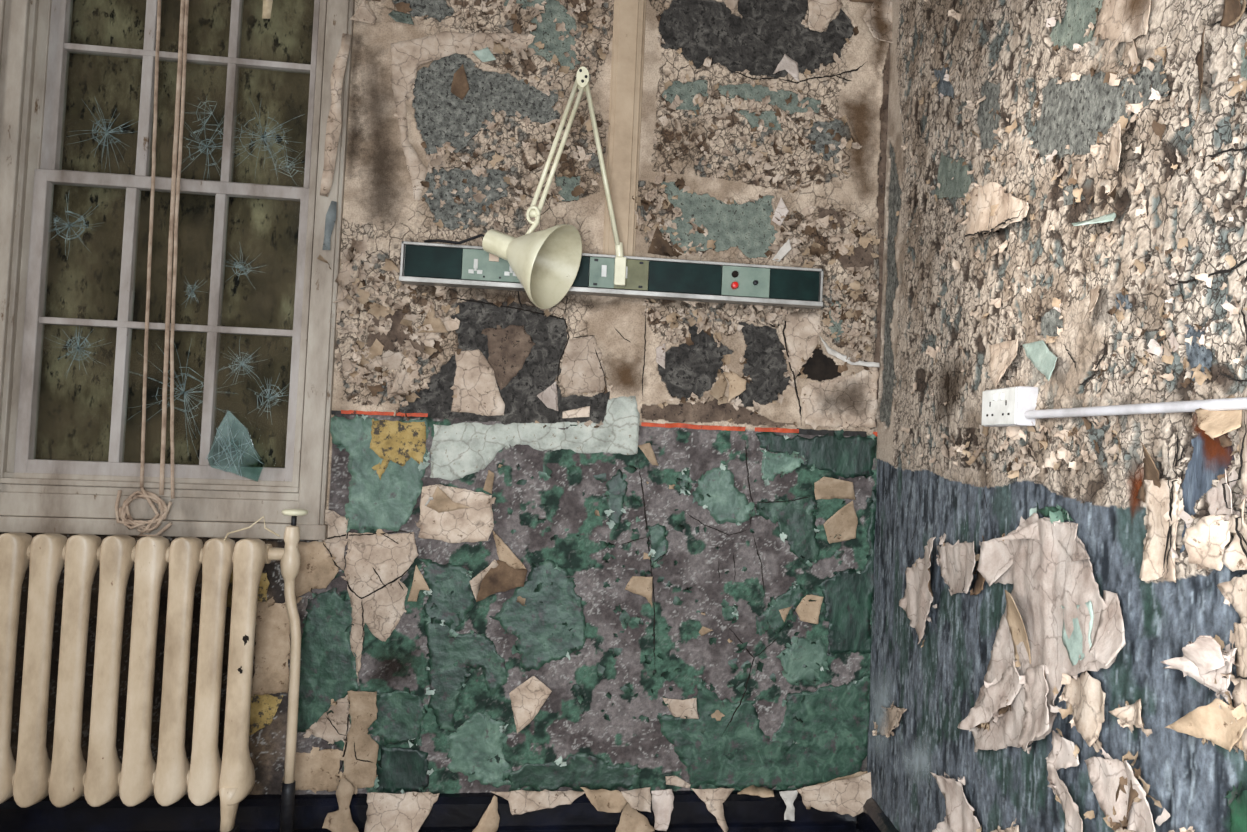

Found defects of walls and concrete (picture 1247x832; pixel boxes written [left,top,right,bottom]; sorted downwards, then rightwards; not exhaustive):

peeling [591,473,824,734]
peeling [899,395,1247,832]
peeling [251,510,440,832]
peeling [484,676,552,734]
peeling [872,701,907,738]
peeling [472,769,674,832]
peeling [691,771,872,832]